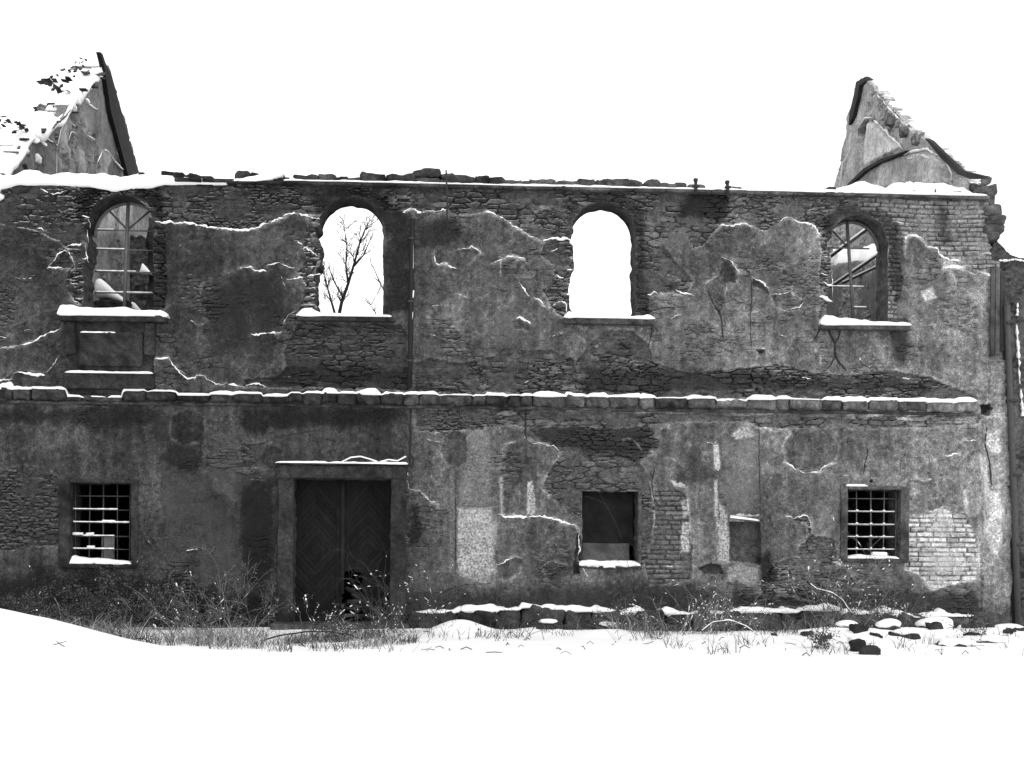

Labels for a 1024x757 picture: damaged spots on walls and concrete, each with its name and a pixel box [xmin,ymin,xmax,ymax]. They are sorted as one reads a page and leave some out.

crack [707,291,723,336]
crack [747,279,755,345]
flaking render [0,116,1007,606]